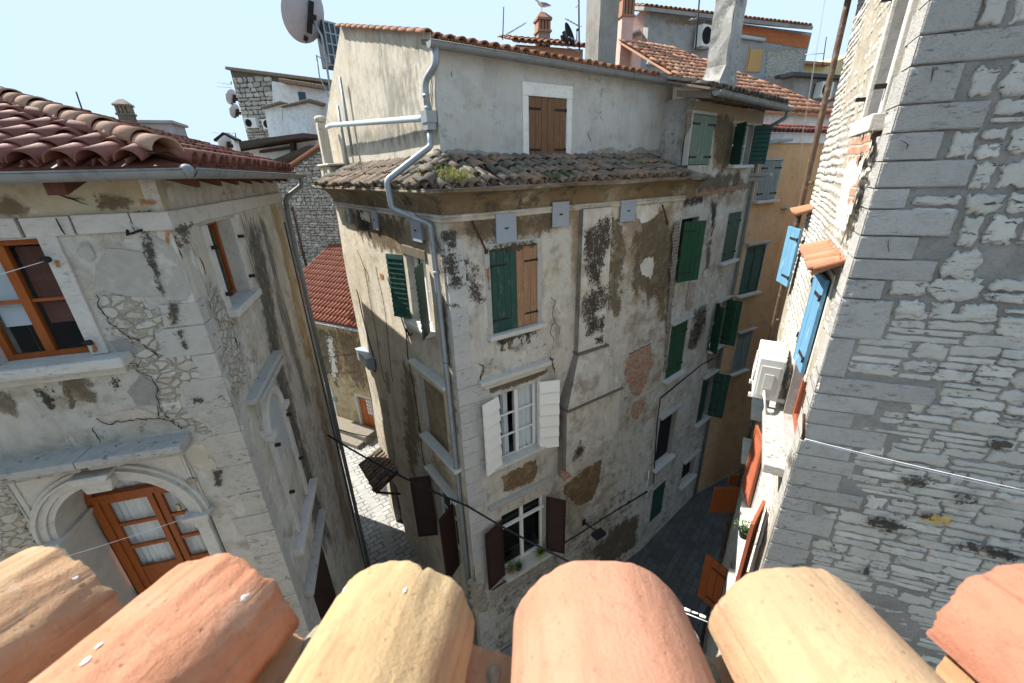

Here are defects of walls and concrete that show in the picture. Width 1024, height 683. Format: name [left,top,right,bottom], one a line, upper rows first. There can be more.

flaking render [846,127,874,163]
damp [139,231,165,297]
damp [439,213,552,308]
damp [582,209,674,345]
flaking render [207,281,250,404]
crack [550,297,560,373]
flaking render [623,220,696,423]
damp [688,304,707,349]
crack [92,406,182,443]
flaking render [500,458,539,493]
flaking render [560,457,603,541]